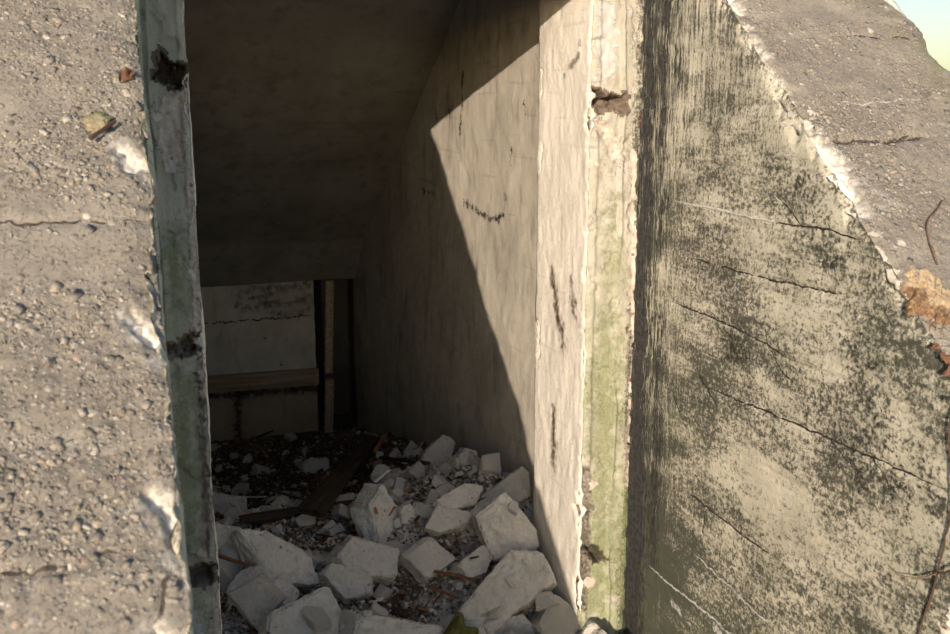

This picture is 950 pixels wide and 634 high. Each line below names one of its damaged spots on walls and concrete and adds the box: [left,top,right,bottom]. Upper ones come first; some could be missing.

spalling [150,44,189,93]
crack [828,135,923,144]
crack [0,219,146,227]
spalling [115,179,220,591]
peeling [589,85,638,487]
water stain [611,0,778,634]
crack [674,302,795,384]
crack [689,257,860,297]
crack [775,194,859,240]
crack [698,373,940,488]
water stain [787,164,854,289]
water stain [804,325,949,526]